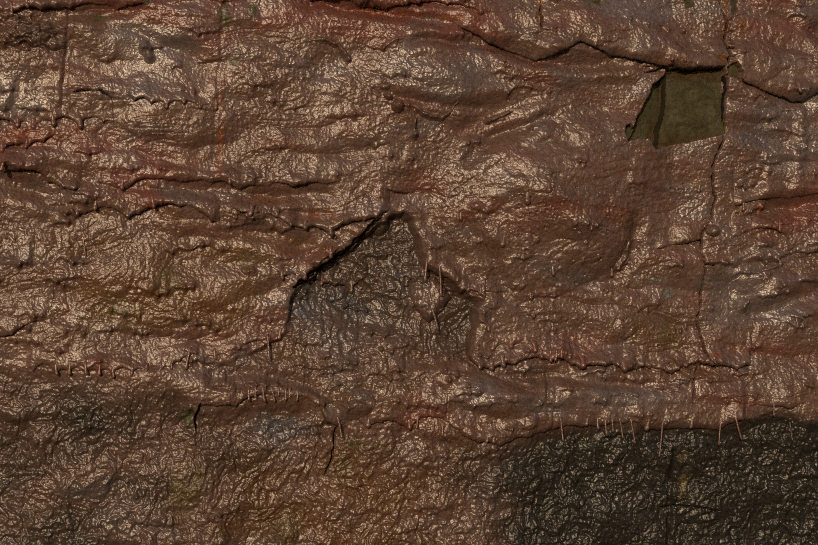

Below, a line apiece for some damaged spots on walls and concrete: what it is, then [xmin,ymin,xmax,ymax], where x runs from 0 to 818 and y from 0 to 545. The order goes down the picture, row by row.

spalling [625,64,739,149]
crack [644,25,734,210]
crack [293,218,381,288]